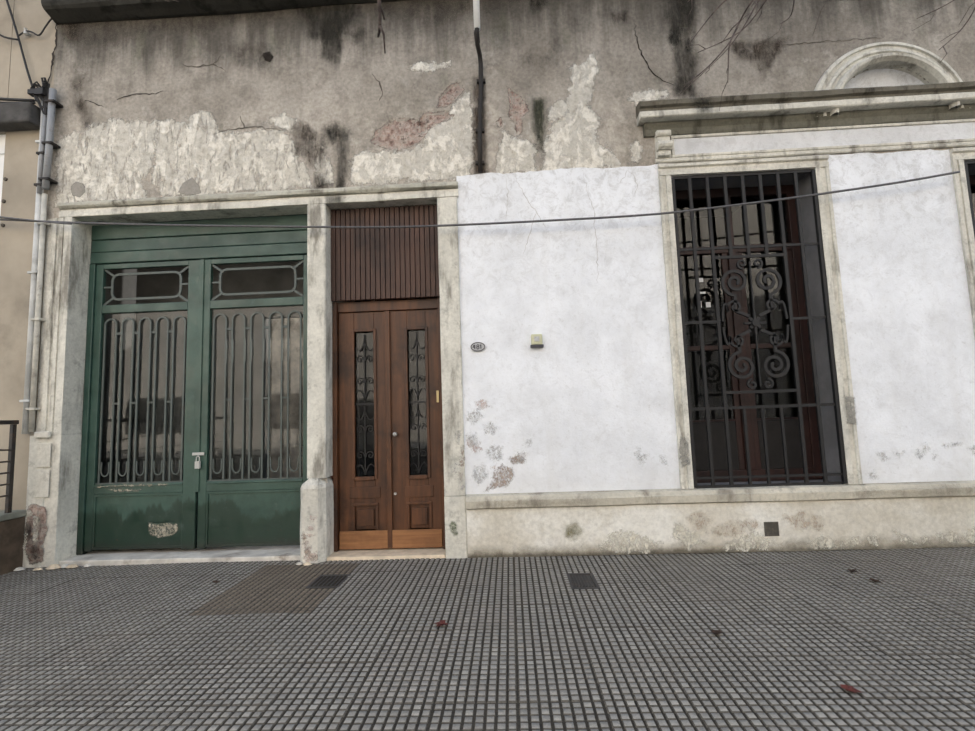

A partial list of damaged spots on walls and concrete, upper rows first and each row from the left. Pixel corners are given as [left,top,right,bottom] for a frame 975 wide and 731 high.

water stain [302,4,355,60]
peeling [53,111,334,207]
water stain [295,124,325,189]
water stain [325,127,346,203]
peeling [348,82,476,186]
peeling [410,60,451,73]
peeling [496,52,643,174]
peeling [628,90,670,106]
water stain [643,0,975,138]
peeling [458,437,524,490]
flaking render [23,504,48,565]